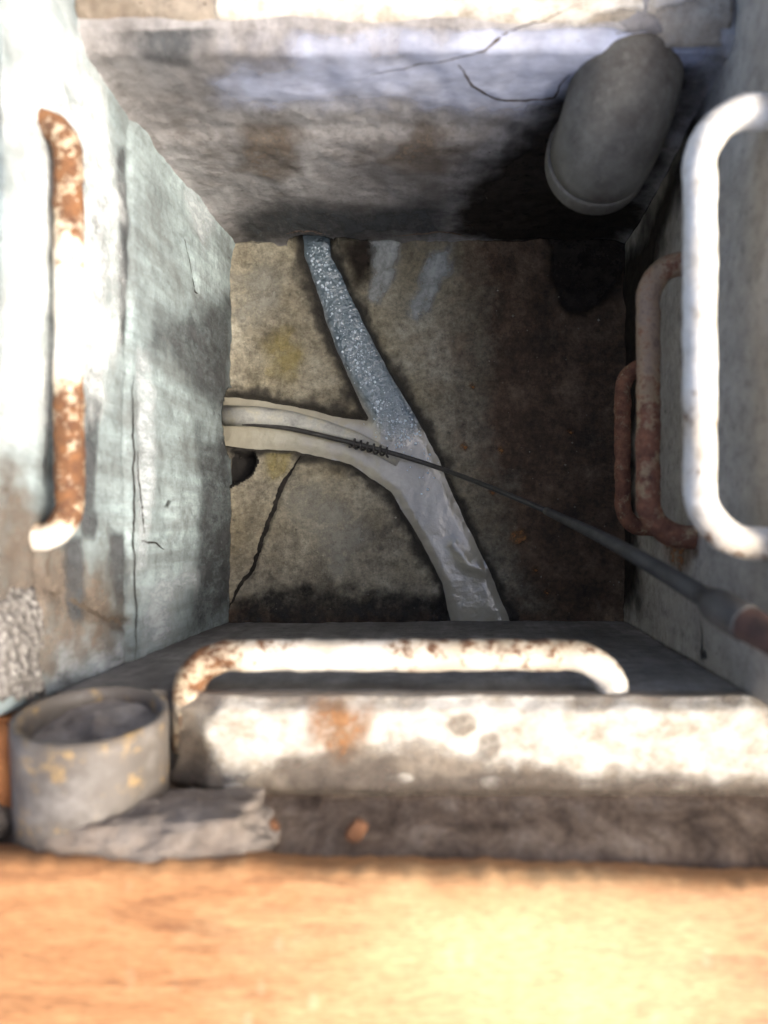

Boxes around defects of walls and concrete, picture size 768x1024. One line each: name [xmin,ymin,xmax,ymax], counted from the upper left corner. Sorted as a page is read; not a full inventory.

crack [366,3,585,102]
water stain [454,92,696,366]
hole [229,449,259,488]
crack [229,456,301,607]
water stain [623,559,640,606]